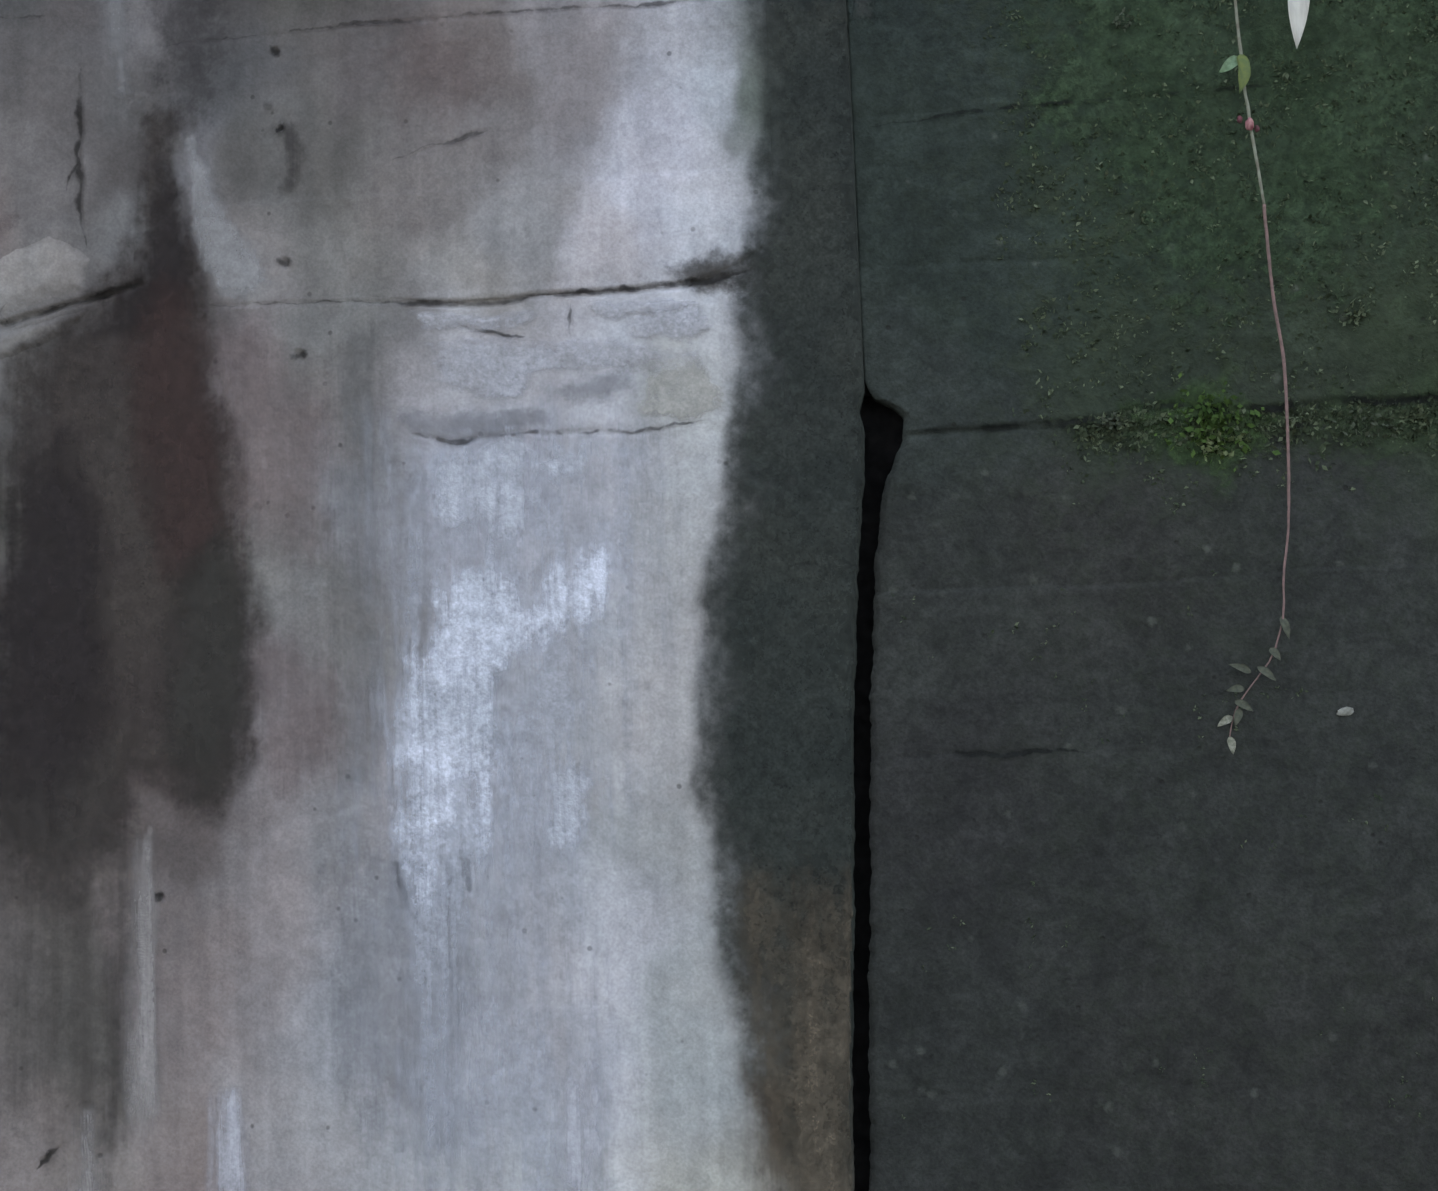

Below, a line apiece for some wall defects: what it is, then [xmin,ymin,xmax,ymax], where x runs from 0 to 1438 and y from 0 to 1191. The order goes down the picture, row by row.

leakage [678,254,751,291]
crack [1,284,137,325]
crack [385,298,443,306]
crack [478,273,739,337]
crack [982,416,1093,431]
crack [1161,402,1292,413]
crack [1344,395,1438,405]
crack [847,5,939,1191]
leakage [0,113,263,1191]
crack [956,748,1078,758]
efflorescence [393,427,628,1123]
leakage [748,885,853,1191]